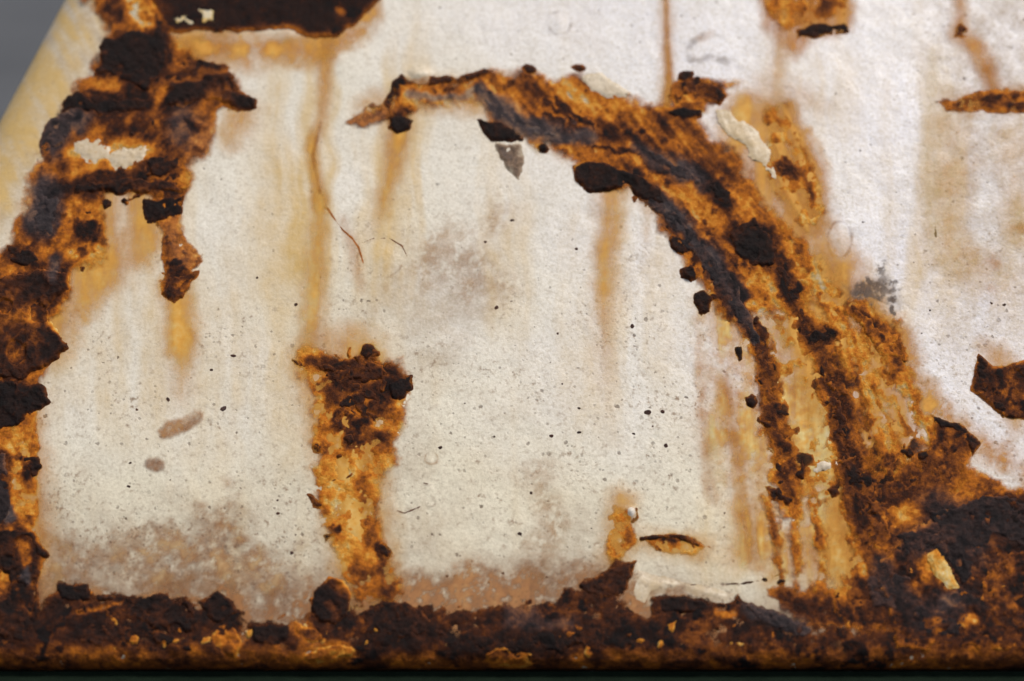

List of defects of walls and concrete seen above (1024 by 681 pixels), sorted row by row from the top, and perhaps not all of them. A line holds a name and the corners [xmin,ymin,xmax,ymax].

rust [0,0,379,434]
rust [0,332,1024,671]
rust [346,25,1024,650]
rust [763,0,853,52]